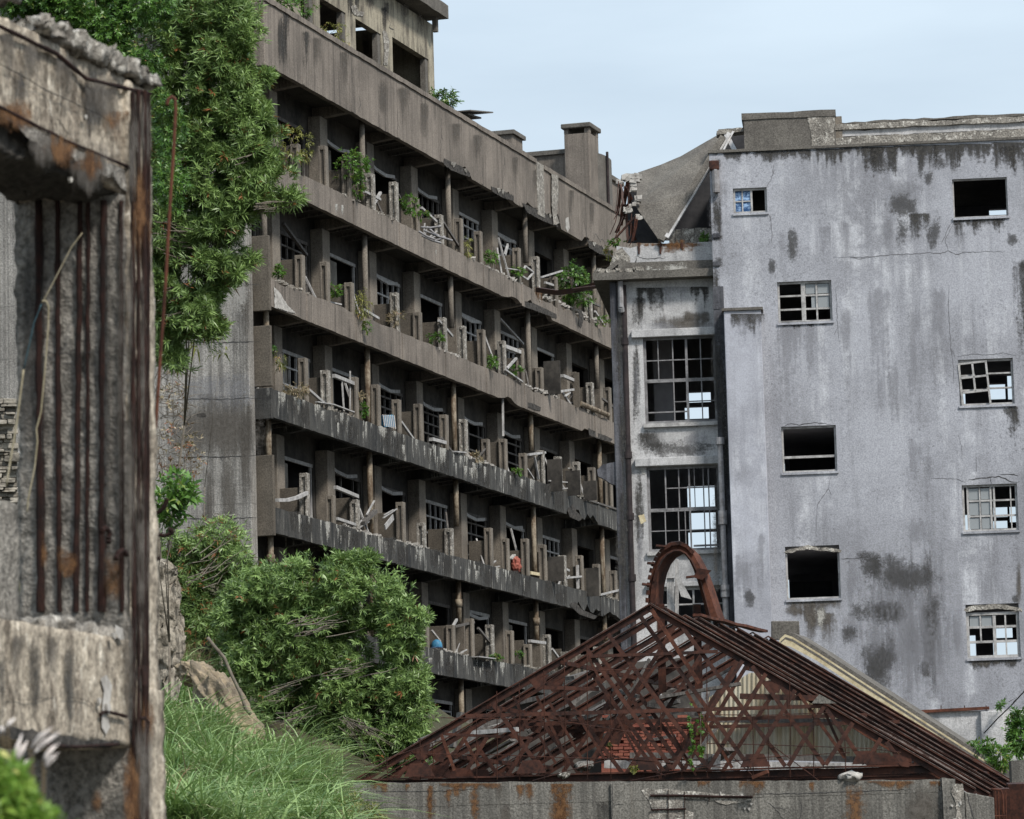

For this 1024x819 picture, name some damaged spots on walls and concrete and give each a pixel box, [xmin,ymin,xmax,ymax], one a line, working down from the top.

spalling [7,119,60,144]
spalling [67,147,86,162]
spalling [100,157,127,192]
rust [86,81,149,241]
damp [891,191,940,248]
crack [842,225,1000,259]
damp [954,218,1004,233]
rust [98,224,149,603]
damp [639,259,729,591]
damp [860,551,942,685]
spalling [0,675,119,748]
rust [427,783,502,819]